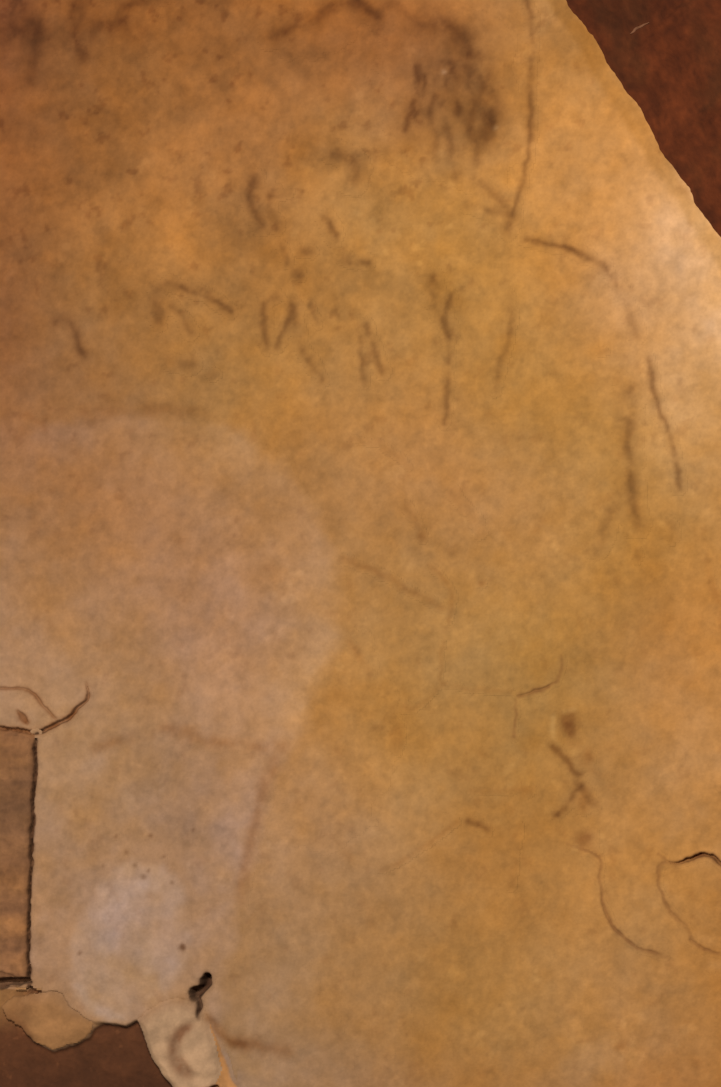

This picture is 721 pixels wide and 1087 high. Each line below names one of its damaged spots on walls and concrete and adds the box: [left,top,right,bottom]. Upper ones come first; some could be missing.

peeling [0,409,352,1087]
crack [562,839,721,962]